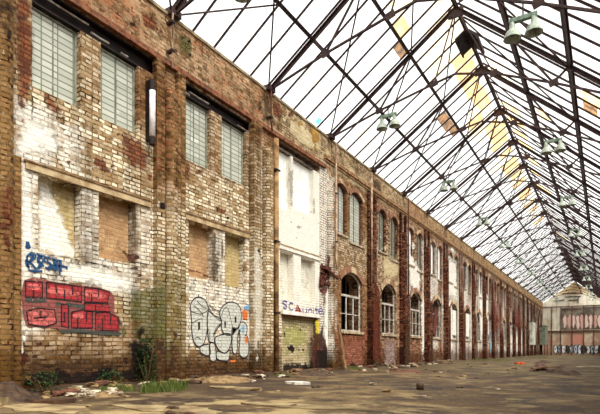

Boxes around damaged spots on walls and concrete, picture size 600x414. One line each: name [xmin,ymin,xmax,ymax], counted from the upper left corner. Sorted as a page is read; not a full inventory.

flaking render [14,0,144,294]
flaking render [409,242,433,354]